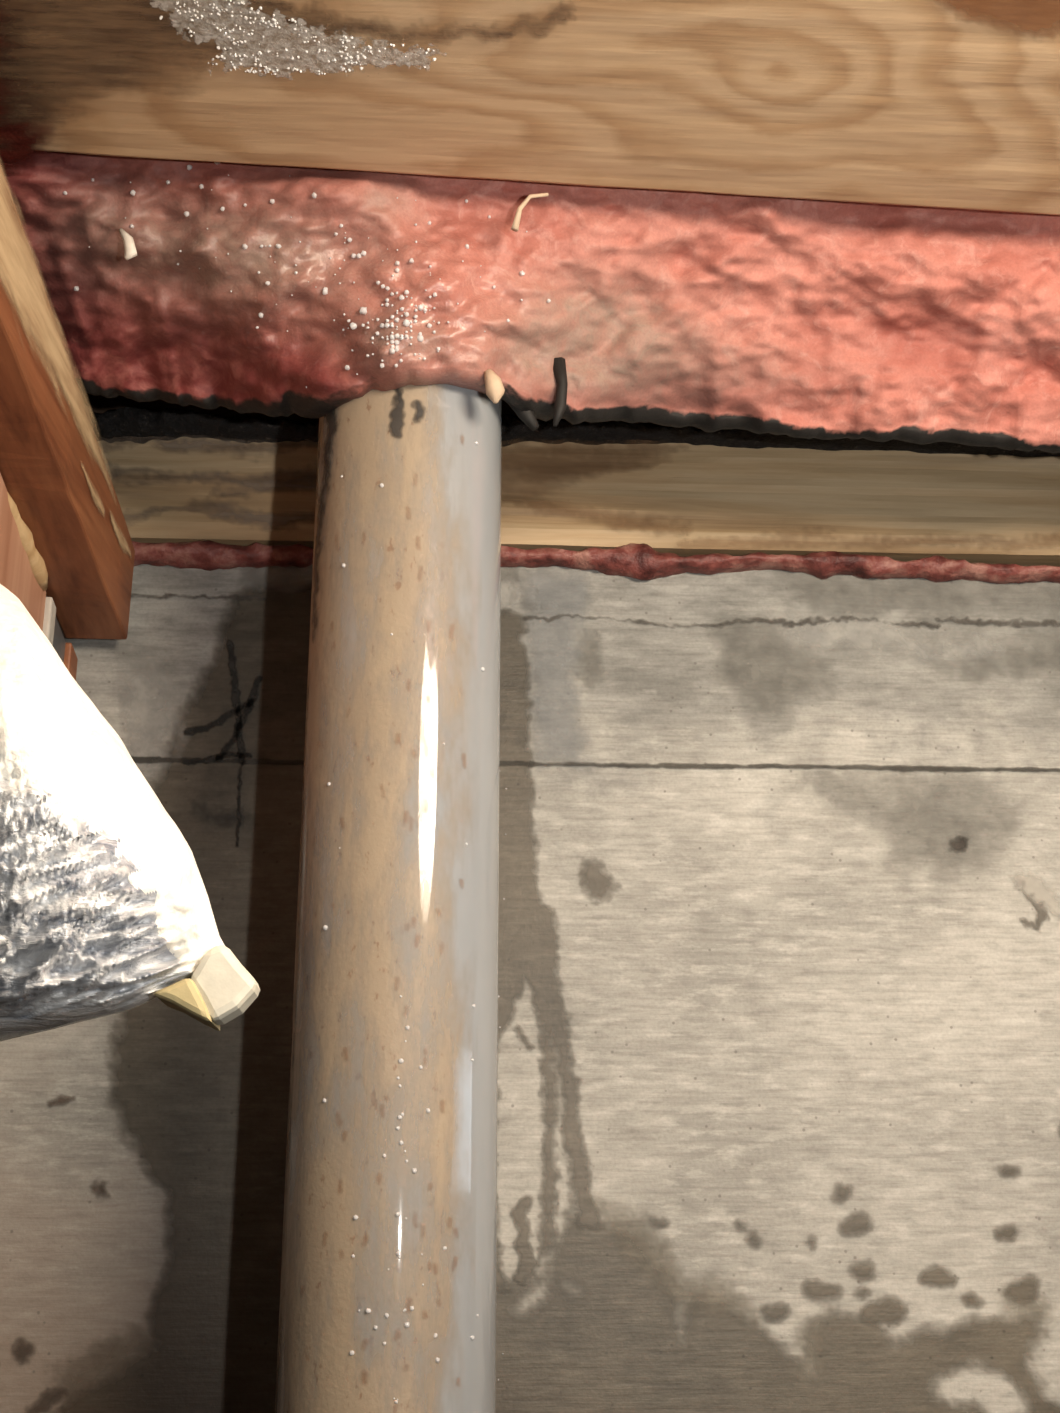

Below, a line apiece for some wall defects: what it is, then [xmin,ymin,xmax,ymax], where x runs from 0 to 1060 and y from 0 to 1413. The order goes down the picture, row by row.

leakage [0,0,570,176]
leakage [944,0,1060,35]
leakage [28,567,312,1413]
leakage [496,567,1060,1413]
leakage [14,1339,34,1362]